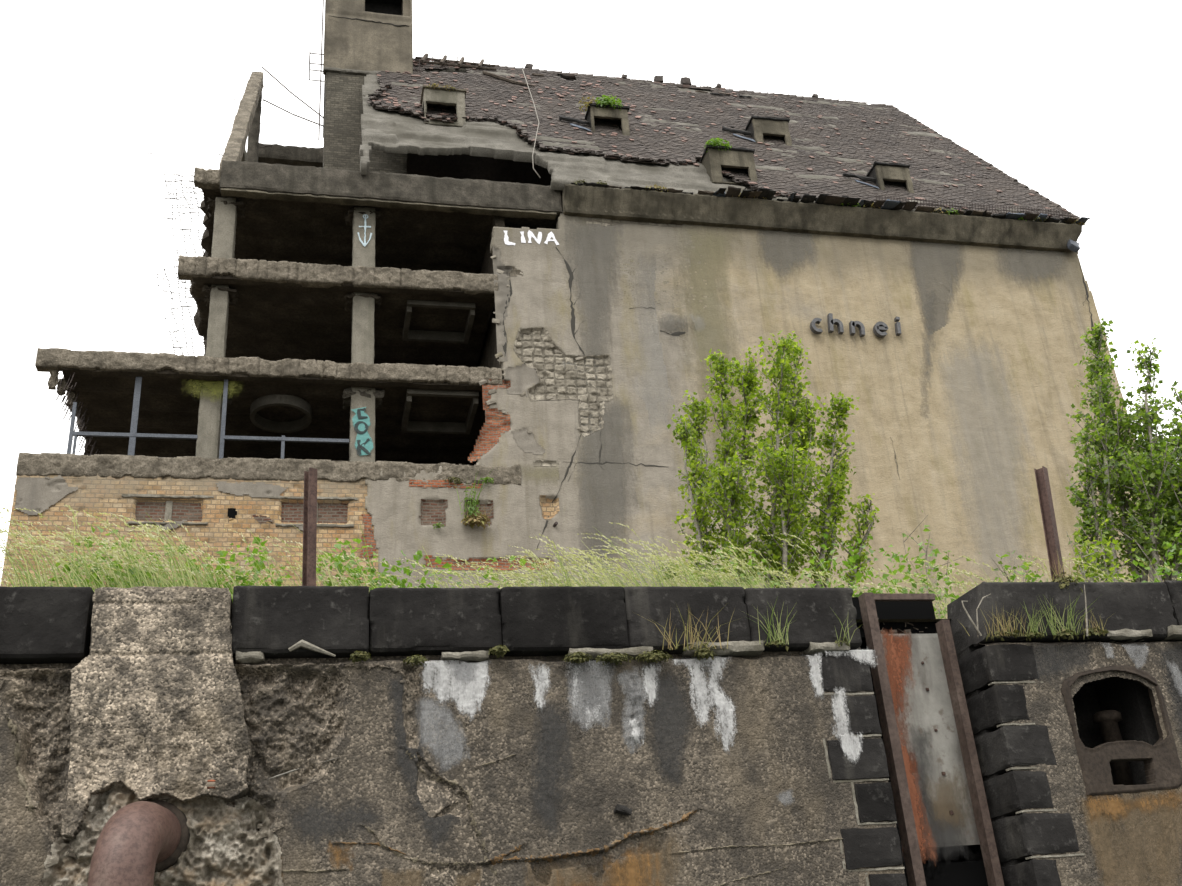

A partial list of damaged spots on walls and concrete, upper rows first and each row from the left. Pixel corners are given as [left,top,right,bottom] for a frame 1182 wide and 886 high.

flaking render [468,246,614,466]
crack [556,247,585,355]
peeling [14,475,78,515]
peeling [215,481,288,520]
flaking render [359,514,376,560]
spalling [0,662,408,886]
crack [269,750,843,886]
water stain [532,661,610,829]
water stain [642,656,736,780]
corrosion [881,632,962,857]
water stain [1033,643,1147,676]
water stain [1162,647,1182,738]